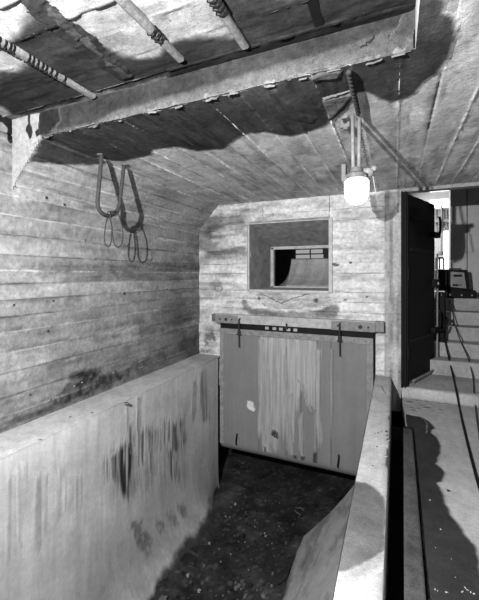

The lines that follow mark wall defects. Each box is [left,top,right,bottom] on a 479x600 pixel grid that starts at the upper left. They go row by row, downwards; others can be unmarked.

damp [0,294,200,433]
damp [100,414,187,507]
damp [144,482,219,600]